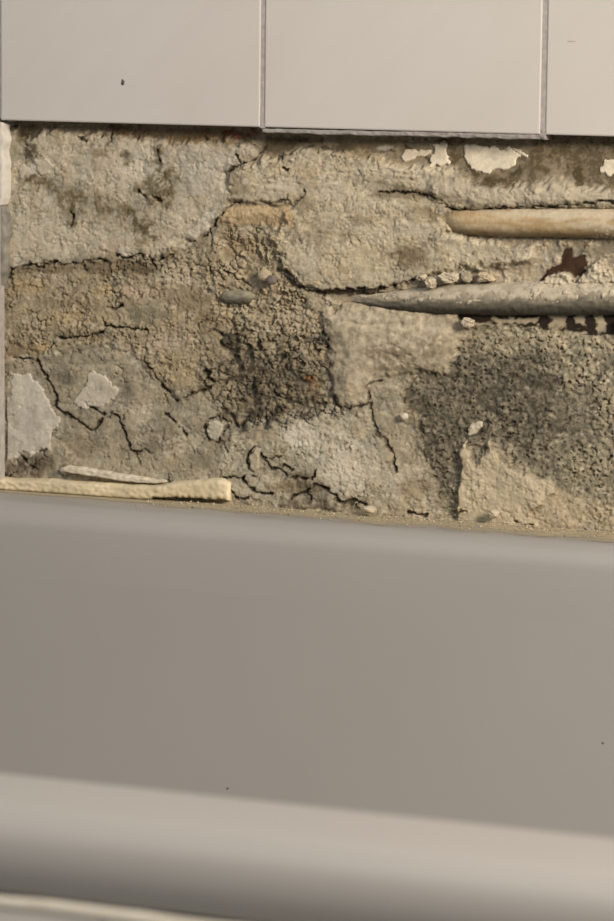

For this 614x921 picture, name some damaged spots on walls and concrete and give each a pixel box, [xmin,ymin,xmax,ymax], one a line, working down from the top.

flaking render [401,141,451,167]
flaking render [463,143,528,174]
flaking render [600,159,614,177]
crack [12,253,175,270]
crack [287,277,415,296]
rust [540,247,588,281]
flaking render [6,372,61,460]
crack [37,359,150,454]
leakage [222,333,327,432]
crack [333,380,398,473]
spalling [401,314,614,518]
crack [223,447,338,500]